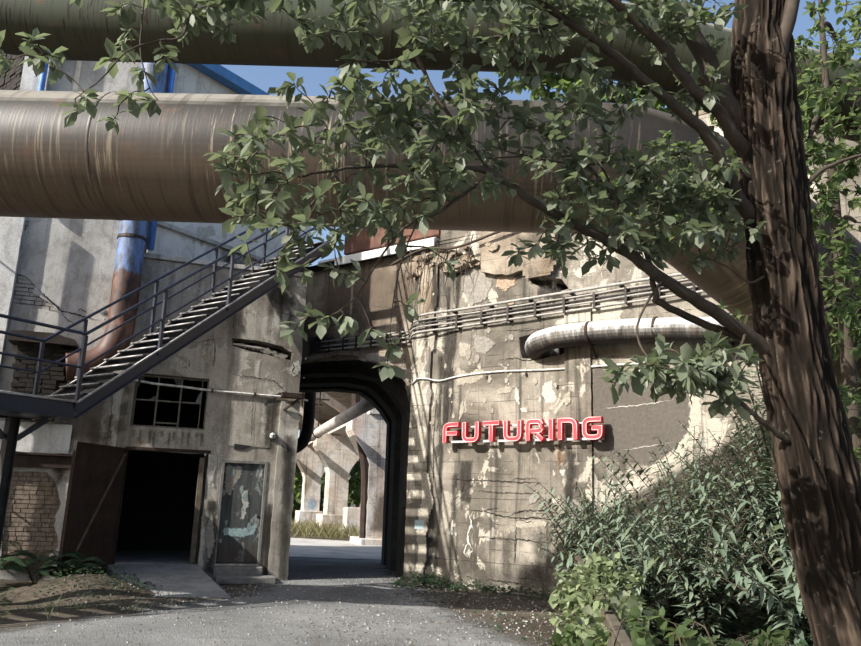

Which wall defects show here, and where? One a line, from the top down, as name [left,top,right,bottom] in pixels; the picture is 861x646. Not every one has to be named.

spalling [13,274,58,312]
crack [38,289,95,323]
peeling [462,268,516,312]
leakage [266,400,277,449]
leakage [424,262,471,578]
spalling [1,471,61,571]
peeling [201,453,257,561]
leakage [262,436,292,580]